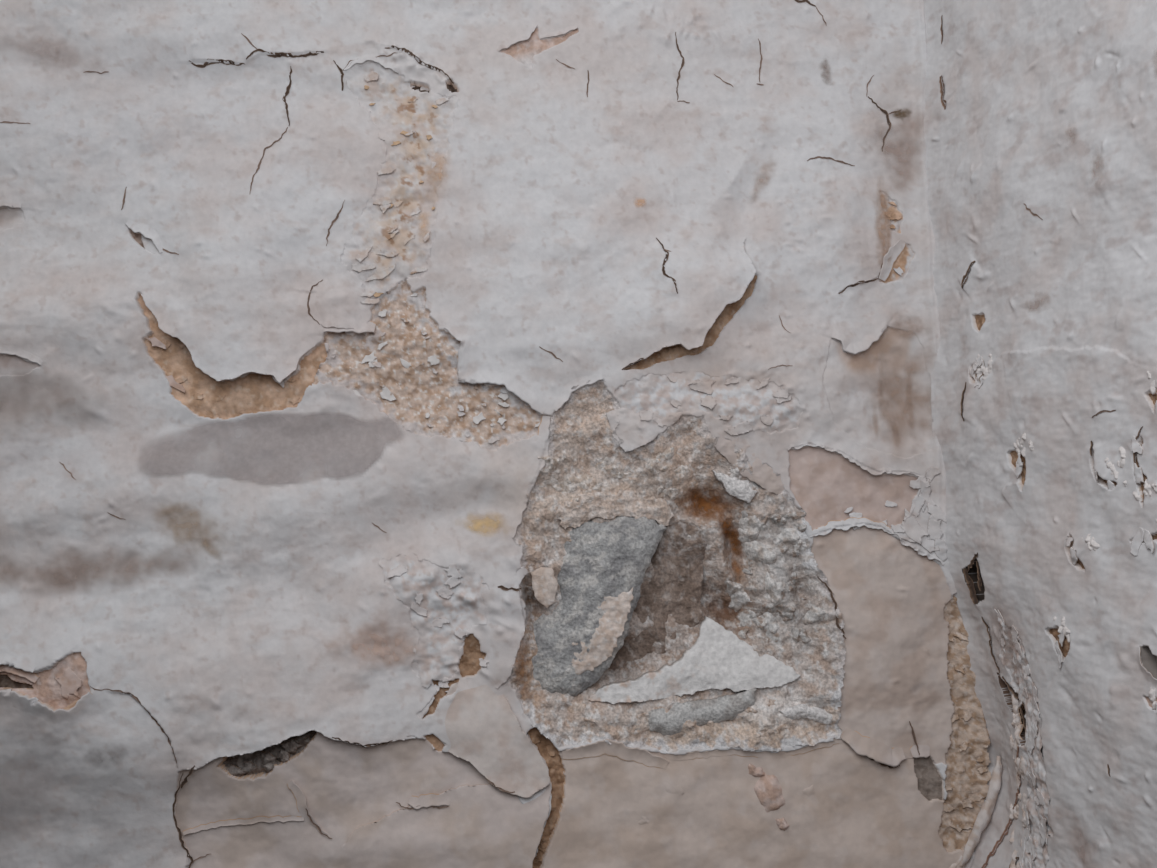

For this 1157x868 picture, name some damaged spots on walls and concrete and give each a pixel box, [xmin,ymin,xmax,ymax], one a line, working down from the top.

crack [189,33,454,191]
crack [866,75,902,152]
crack [656,238,678,294]
peeling [0,345,43,376]
spalling [138,54,1039,868]
corrosion [692,493,741,572]
flaking render [0,675,33,688]
spalling [1136,647,1157,714]
crack [90,686,209,868]
crack [306,809,332,839]
crack [332,737,393,747]
crack [528,727,564,868]